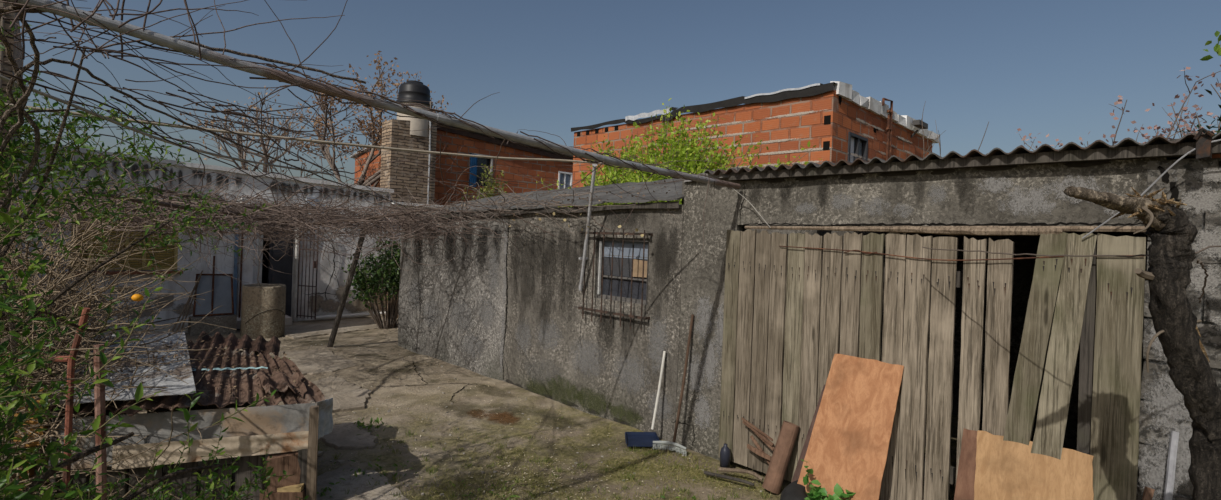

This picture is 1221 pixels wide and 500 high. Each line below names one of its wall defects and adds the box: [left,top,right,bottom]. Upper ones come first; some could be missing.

peeling [1181,168,1221,214]
water stain [655,231,678,279]
peeling [1189,227,1221,294]
water stain [405,224,672,418]